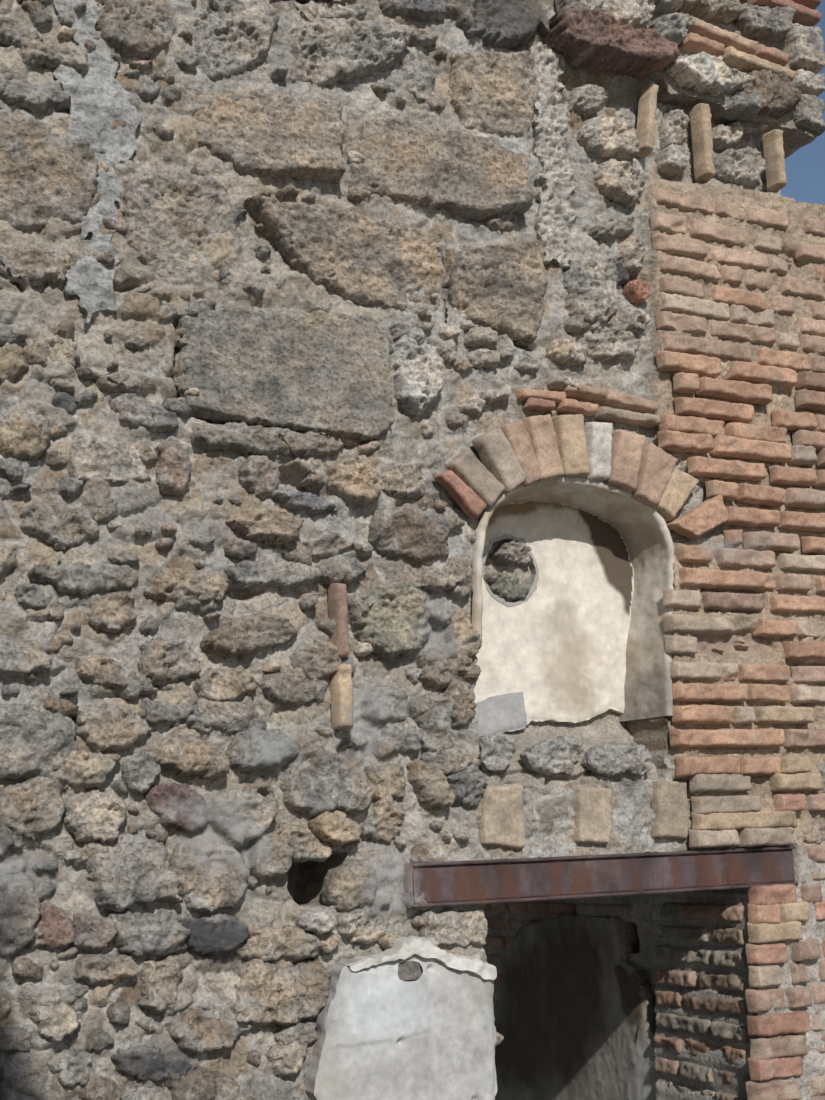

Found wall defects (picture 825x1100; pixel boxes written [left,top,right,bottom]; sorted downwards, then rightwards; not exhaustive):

crack [441,262,449,323]
crack [477,325,531,356]
water stain [495,922,602,1083]
water stain [615,966,649,1023]